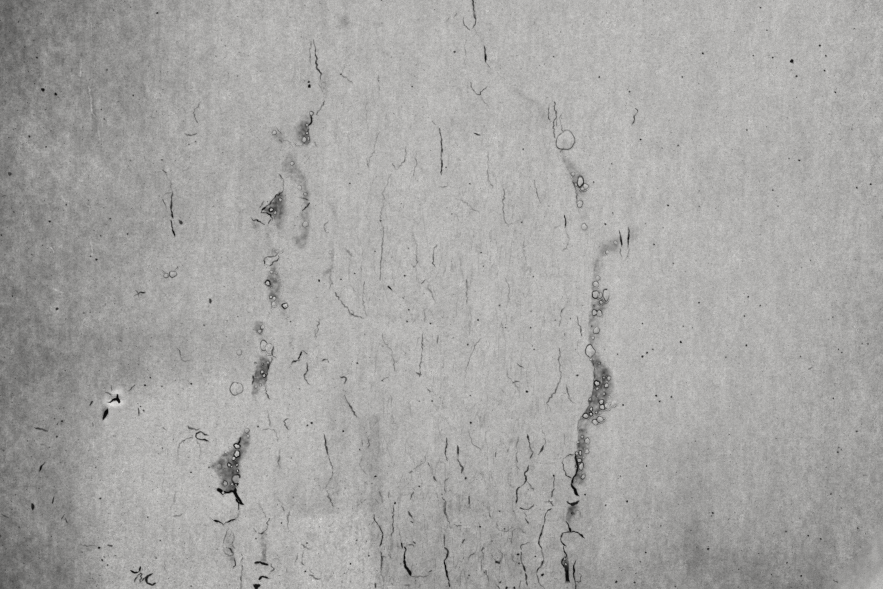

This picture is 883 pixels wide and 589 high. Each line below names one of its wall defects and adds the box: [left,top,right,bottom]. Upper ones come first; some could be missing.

leakage [208,426,253,526]
leakage [250,110,318,406]
leakage [563,160,592,231]
leakage [561,223,641,504]